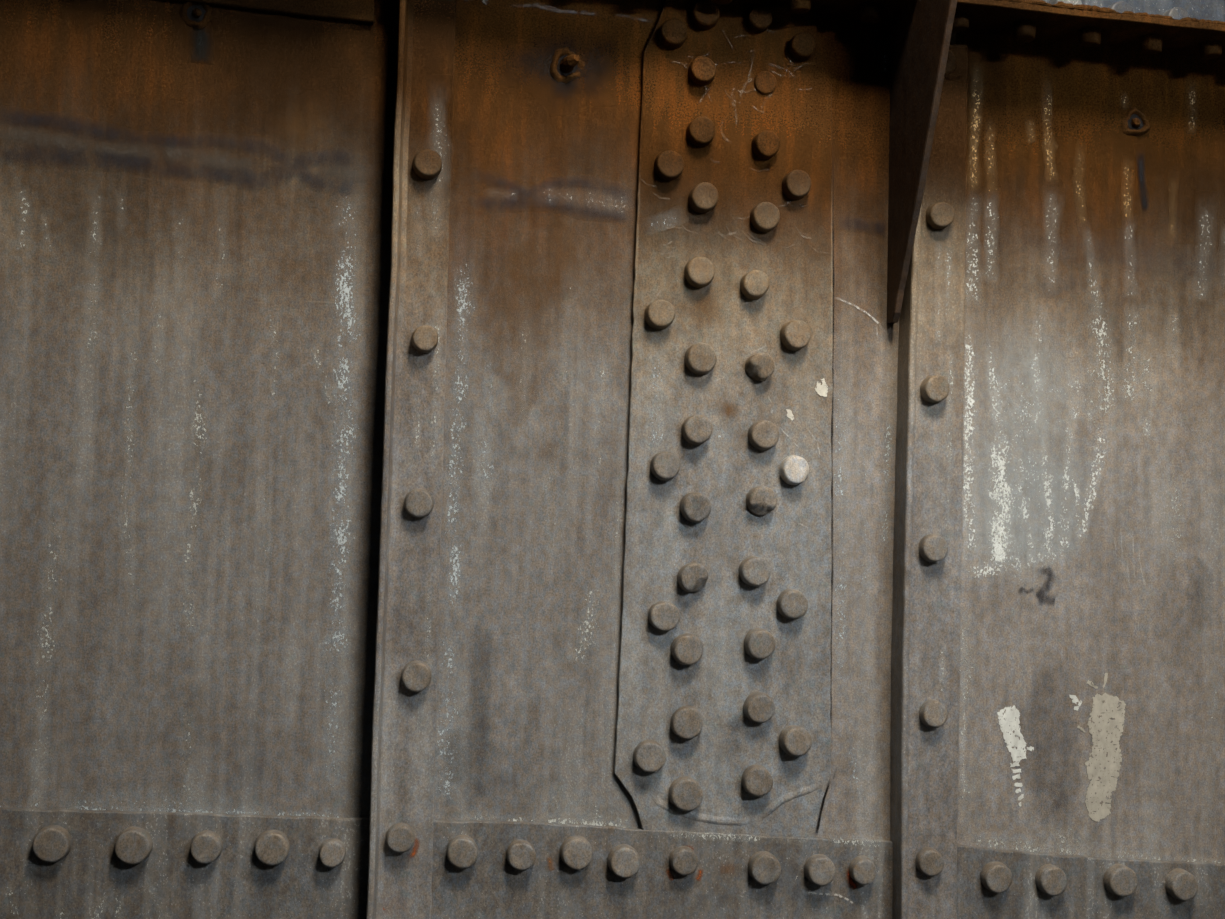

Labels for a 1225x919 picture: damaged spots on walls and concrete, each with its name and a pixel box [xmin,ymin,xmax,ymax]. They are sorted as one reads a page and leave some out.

corrosion [0,0,891,264]
damp [970,79,997,191]
corrosion [924,32,1225,299]
damp [966,207,994,299]
damp [315,204,360,664]
damp [947,263,1152,578]
damp [34,607,56,771]
peeling [997,705,1034,806]
peeling [1069,673,1126,822]